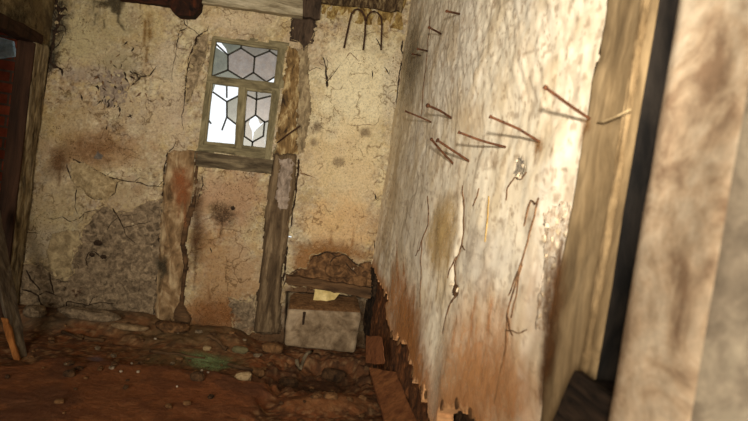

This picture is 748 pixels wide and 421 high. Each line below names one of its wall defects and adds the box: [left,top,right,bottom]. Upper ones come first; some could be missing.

crack [50,21,209,243]
crack [22,270,113,306]
flaking render [18,196,164,315]
flaking render [287,251,430,421]
crack [442,172,527,334]
crack [494,198,563,403]